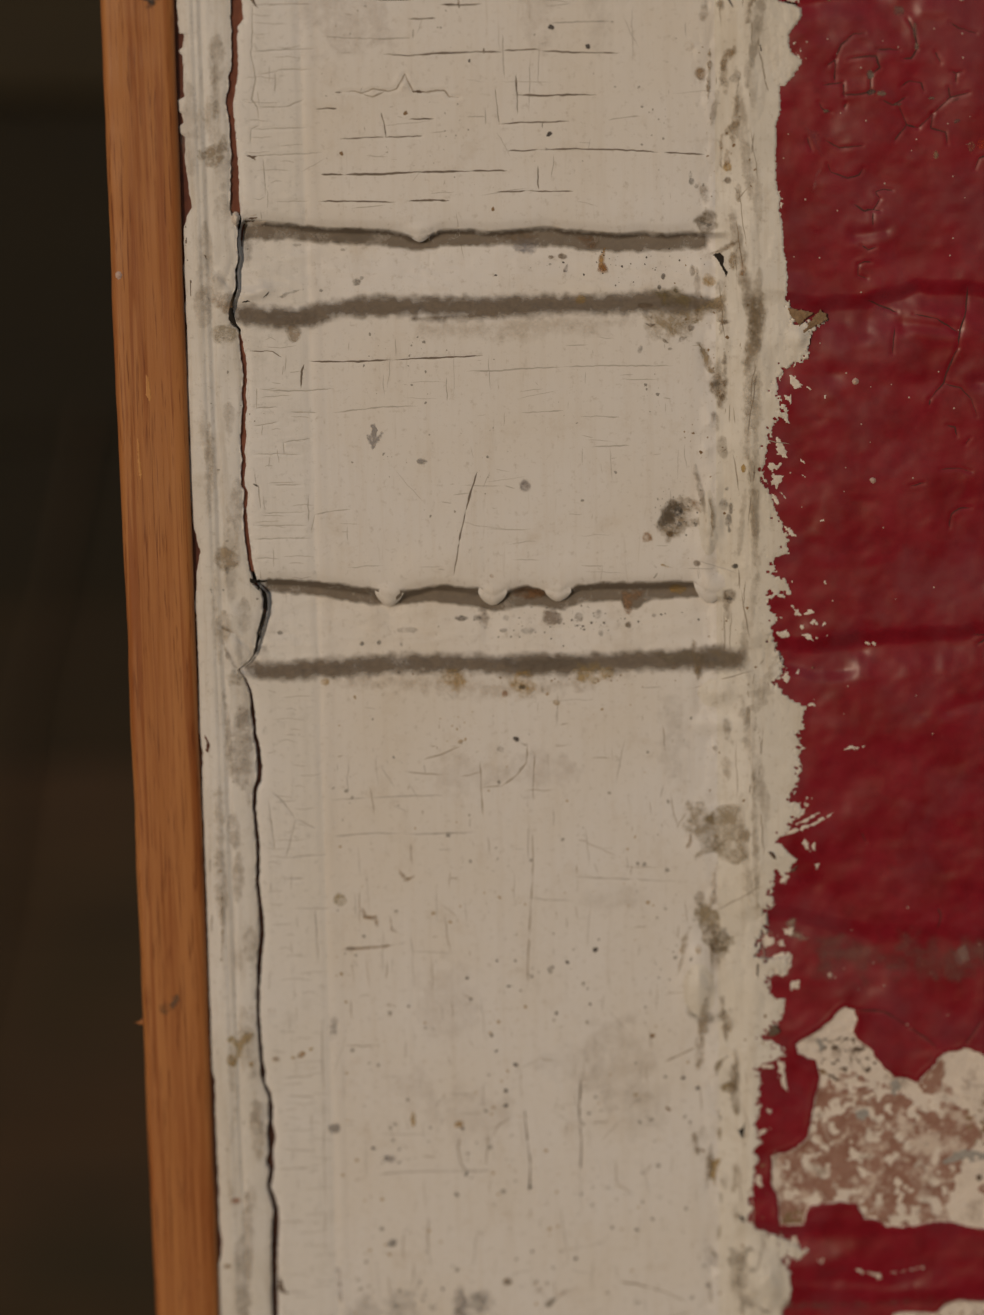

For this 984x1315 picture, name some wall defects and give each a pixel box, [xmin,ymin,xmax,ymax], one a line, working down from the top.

peeling [789,375,826,399]
peeling [768,463,786,505]
peeling [776,609,828,641]
crack [226,0,702,1315]
peeling [756,927,800,1036]
spalling [738,1109,772,1145]
peeling [755,1007,984,1229]